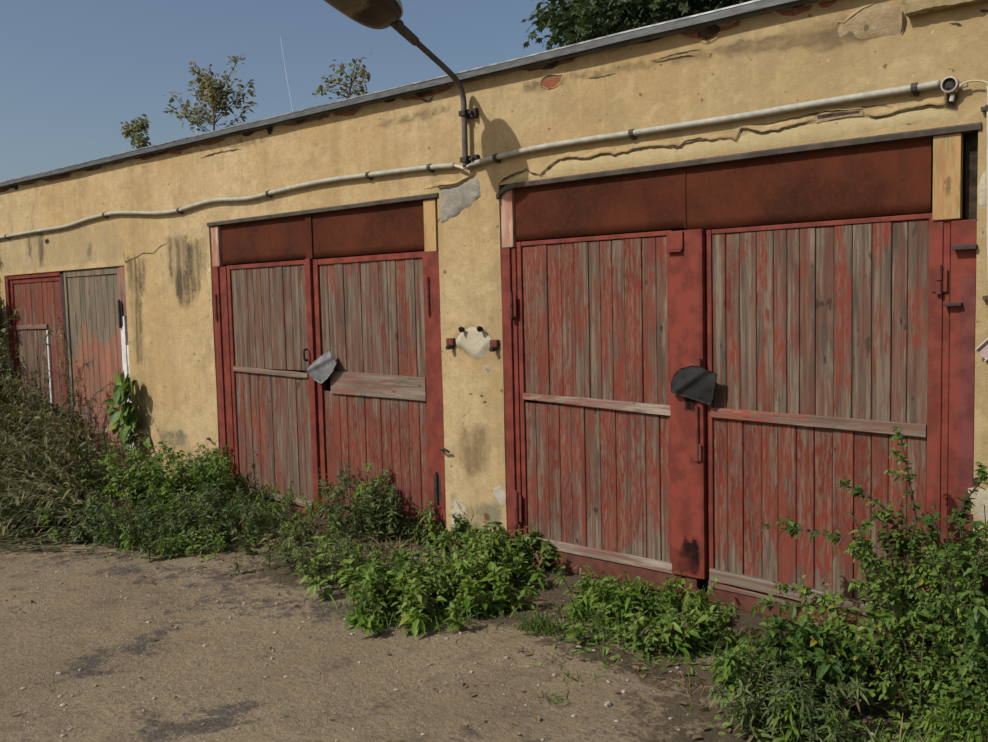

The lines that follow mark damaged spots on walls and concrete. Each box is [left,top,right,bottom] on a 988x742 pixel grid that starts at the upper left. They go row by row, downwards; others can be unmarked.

flaking render [773,0,840,19]
flaking render [833,0,906,41]
flaking render [498,56,579,90]
crack [862,97,946,118]
crack [498,111,828,186]
crack [438,179,468,189]
leakage [170,241,197,300]